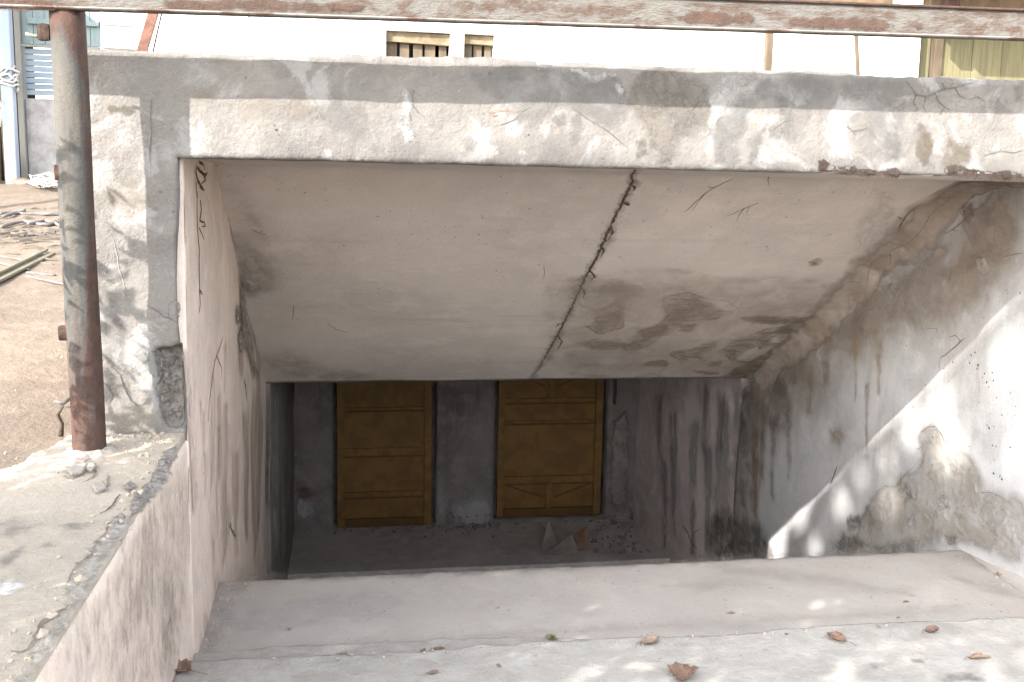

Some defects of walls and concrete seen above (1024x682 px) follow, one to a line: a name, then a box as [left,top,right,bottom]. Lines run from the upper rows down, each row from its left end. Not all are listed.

crack [905,80,985,113]
crack [196,161,208,312]
crack [530,109,638,379]
spalling [810,159,901,179]
spalling [944,165,1023,182]
spalling [134,343,199,515]
damp [581,295,720,350]
damp [648,317,805,378]
damp [690,194,1014,558]
peeling [858,429,1024,560]